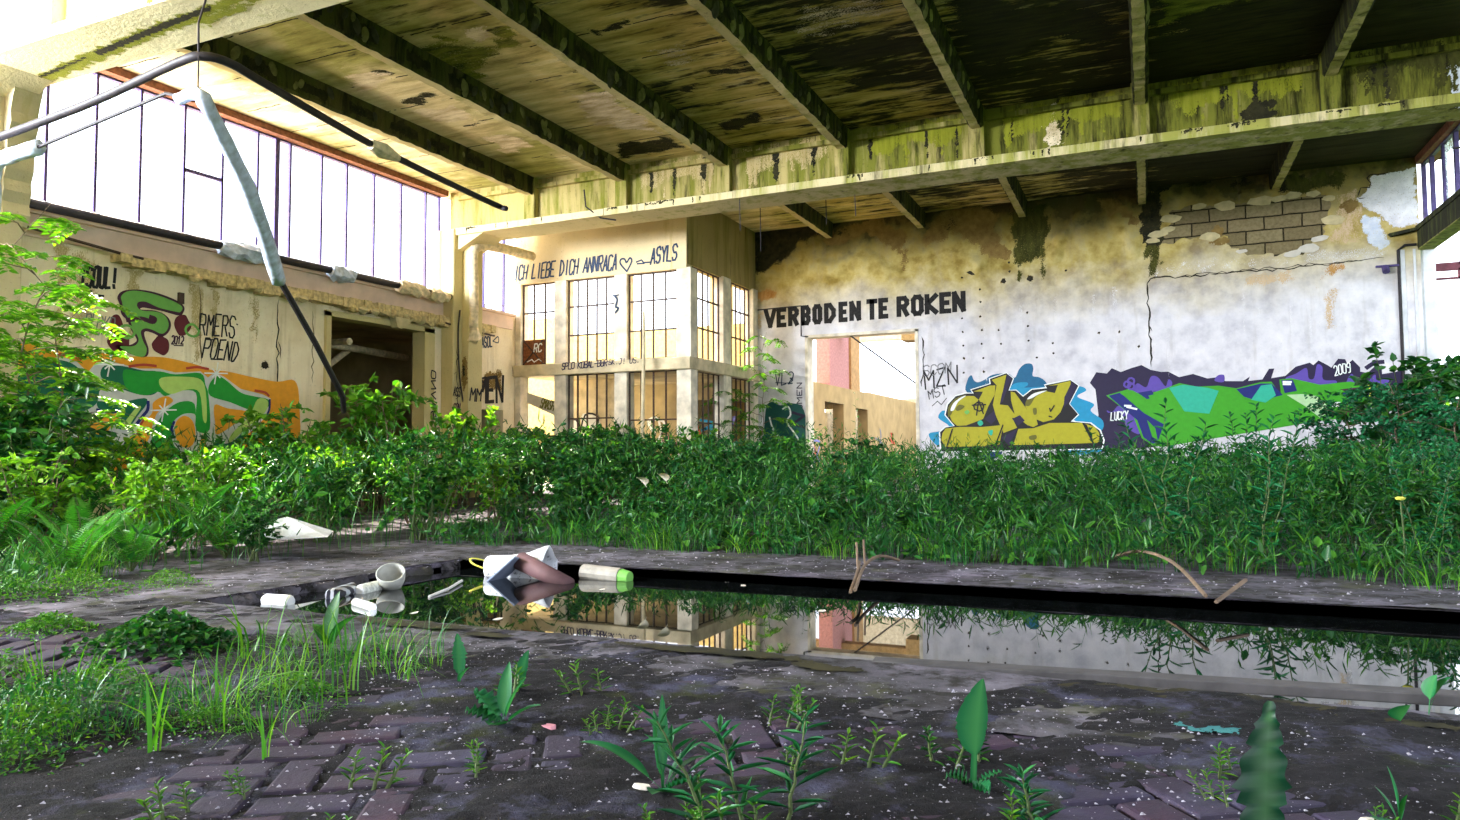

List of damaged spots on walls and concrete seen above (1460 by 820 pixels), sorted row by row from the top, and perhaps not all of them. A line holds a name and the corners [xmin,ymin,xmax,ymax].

leakage [418,25,522,80]
leakage [1148,0,1330,134]
leakage [1428,43,1460,97]
peeling [1447,65,1460,108]
leakage [399,92,533,154]
leakage [572,91,730,211]
leakage [718,112,764,134]
leakage [747,142,824,189]
leakage [1030,102,1162,157]
leakage [755,202,1052,282]
spalling [1146,167,1421,262]
crack [1147,257,1384,364]